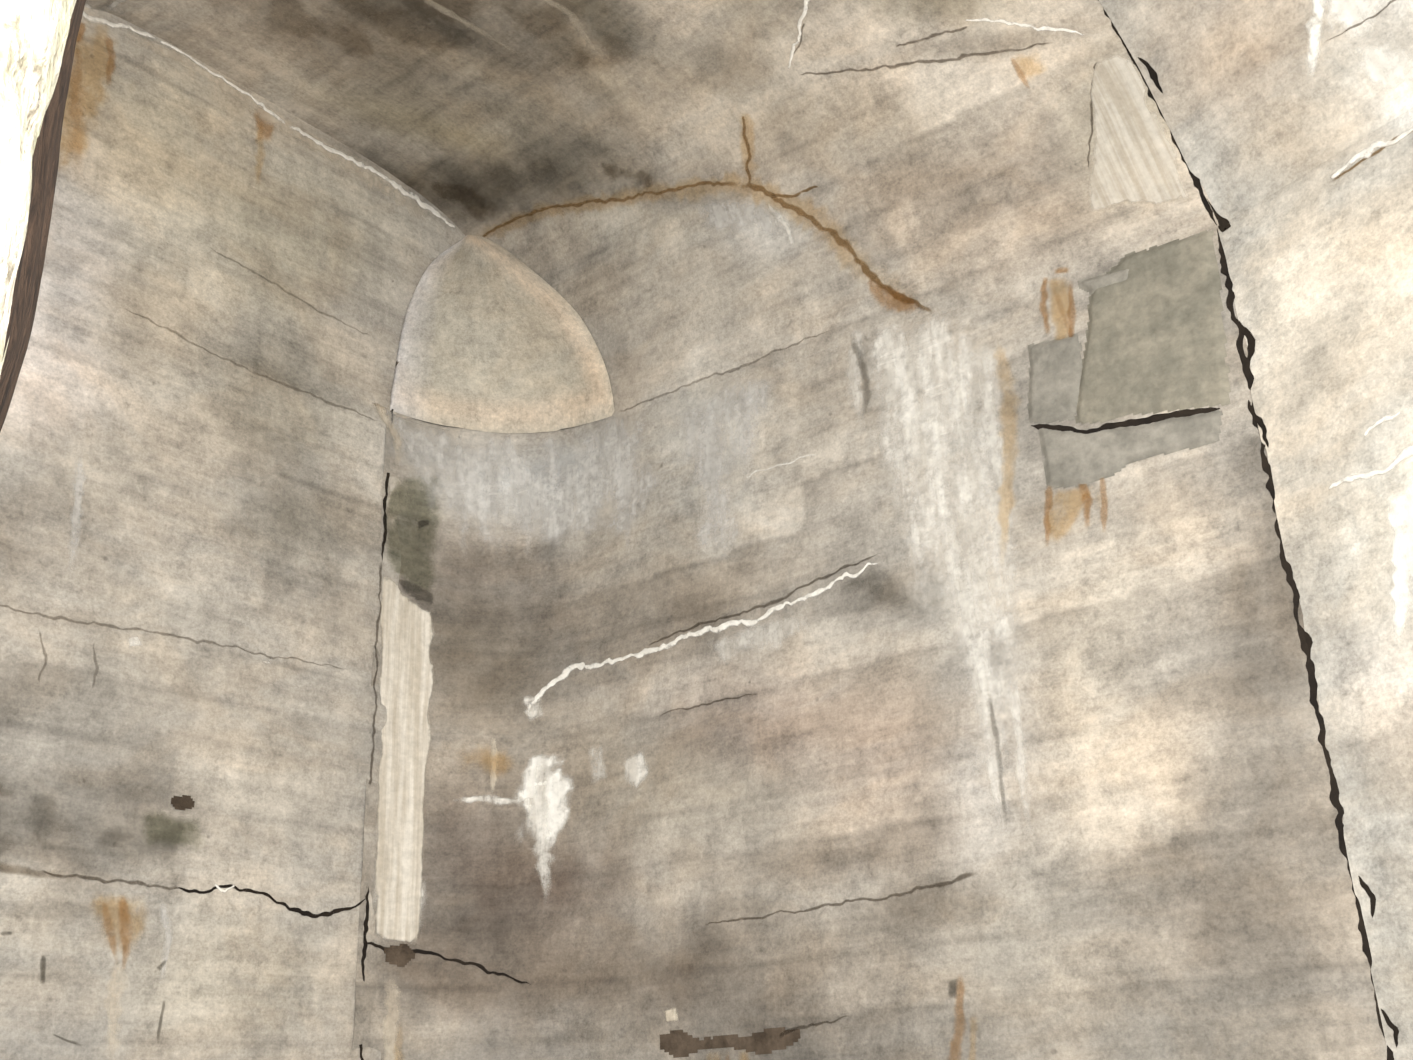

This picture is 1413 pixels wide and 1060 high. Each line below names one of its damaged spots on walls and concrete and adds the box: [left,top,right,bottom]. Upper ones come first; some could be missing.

crack [788,0,809,69]
damp [83,0,455,228]
crack [1331,128,1413,178]
crack [381,473,390,560]
crack [966,0,1399,1060]
damp [1389,496,1410,635]
crack [524,562,876,717]
damp [171,795,195,811]
damp [464,756,570,876]
damp [626,754,647,787]
crack [174,884,529,984]
spalling [660,1009,801,1058]